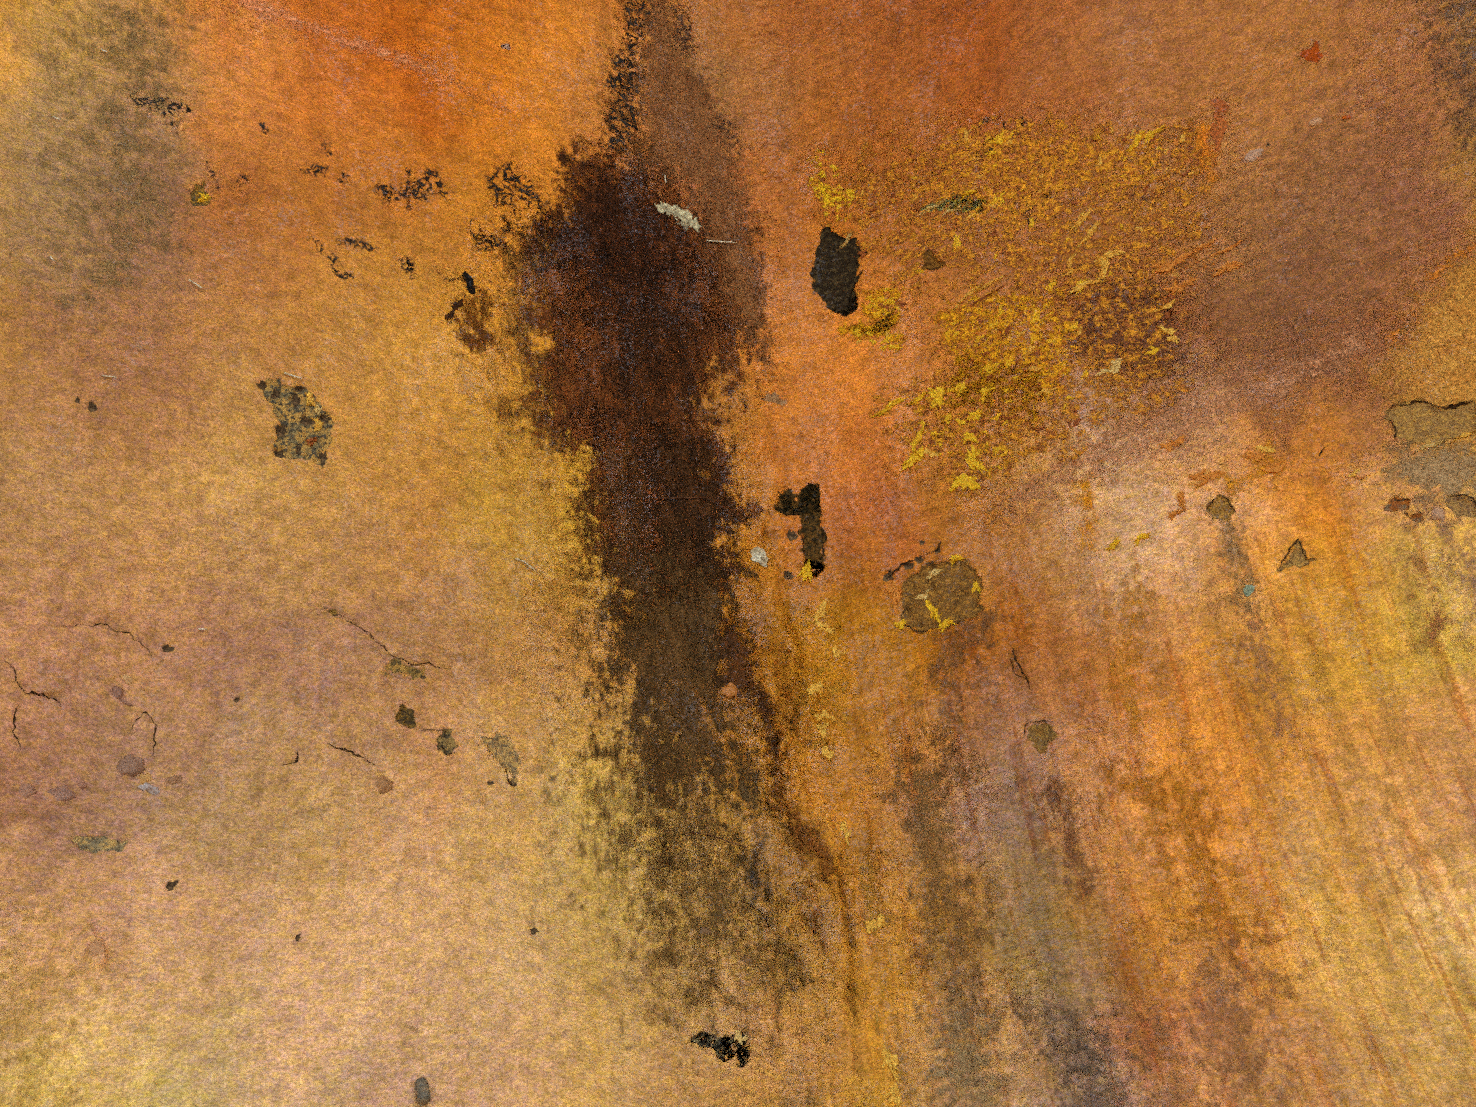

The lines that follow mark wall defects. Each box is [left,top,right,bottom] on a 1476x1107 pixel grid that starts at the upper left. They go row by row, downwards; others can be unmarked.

peeling [807,104,1244,534]
spalling [256,378,335,468]
spalling [1384,397,1476,455]
spalling [774,483,827,583]
peeling [1104,532,1151,551]
spalling [1384,496,1423,522]
spalling [1446,492,1476,517]
spalling [883,539,984,634]
peeling [812,599,847,659]
peeling [806,681,837,763]
rust [715,616,856,984]
spalling [691,1029,749,1067]